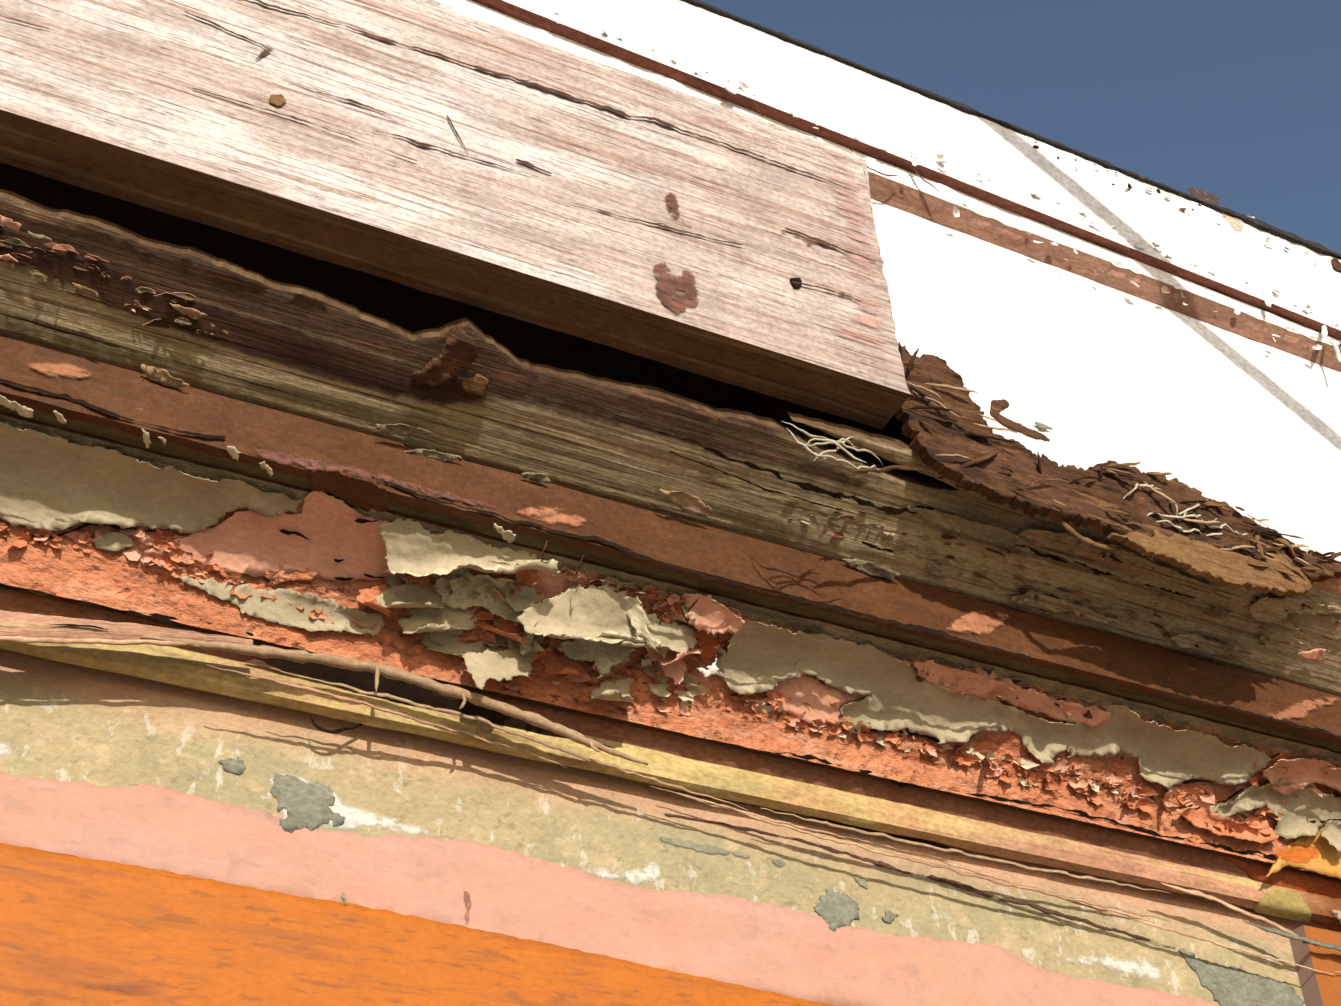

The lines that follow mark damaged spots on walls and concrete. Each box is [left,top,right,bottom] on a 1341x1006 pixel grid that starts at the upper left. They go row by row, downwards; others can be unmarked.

peeling [695,69,756,96]
peeling [1094,163,1208,215]
peeling [1214,213,1254,230]
peeling [1310,324,1341,363]
peeling [140,364,190,388]
spalling [462,374,489,397]
crack [29,522,171,539]
crack [0,584,212,628]
peeling [0,395,1341,844]
peeling [814,886,860,932]
peeling [882,910,898,923]
peeling [1178,948,1305,1006]